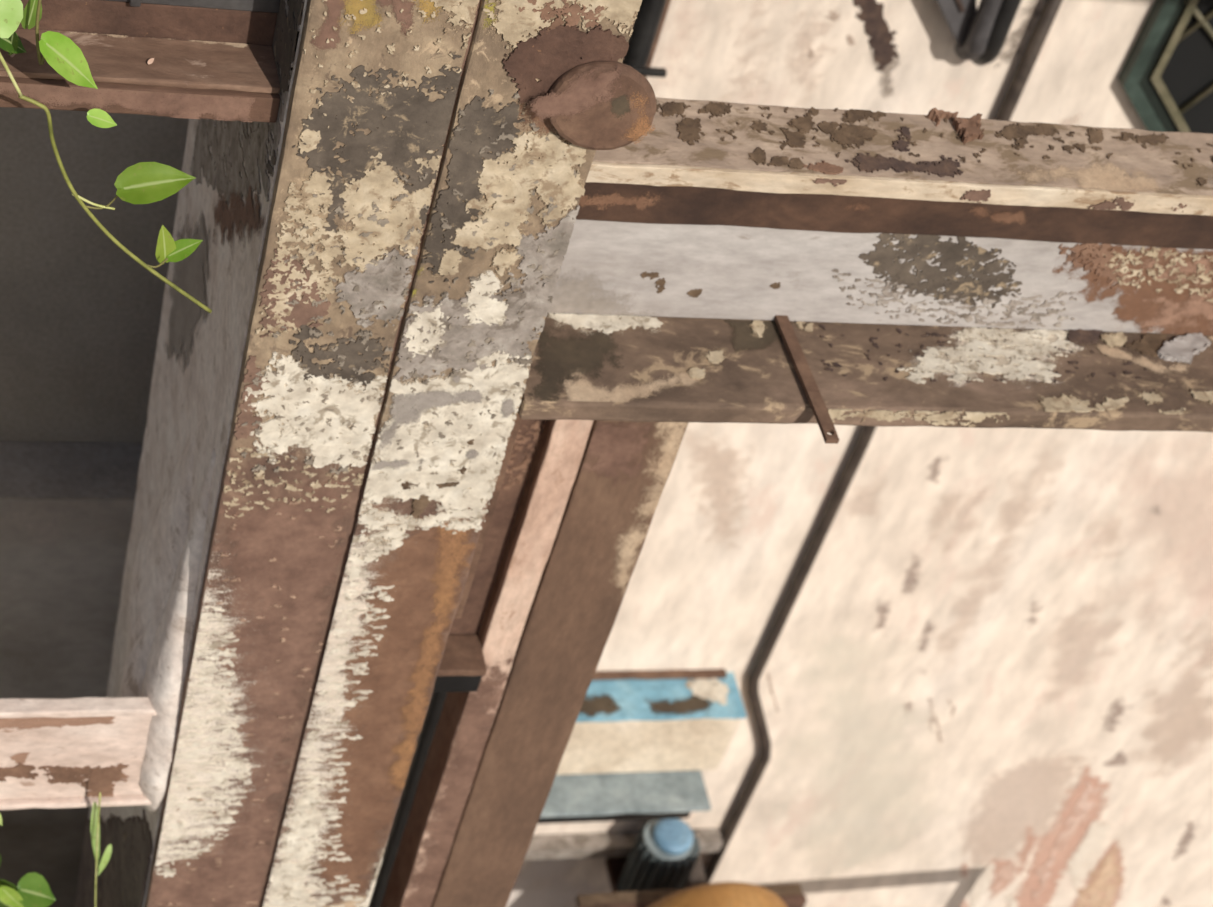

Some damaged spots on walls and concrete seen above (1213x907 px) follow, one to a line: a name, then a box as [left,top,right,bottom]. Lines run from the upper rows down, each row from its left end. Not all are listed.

rust [502,0,655,145]
spalling [825,0,898,71]
peeling [655,100,1169,178]
peeling [961,189,991,204]
peeling [832,233,1213,415]
rust [1051,244,1213,357]
peeling [190,0,670,907]
peeling [828,409,1010,427]
peeling [74,585,296,907]
rust [148,477,488,907]
rust [401,652,515,907]
peeling [685,678,729,705]